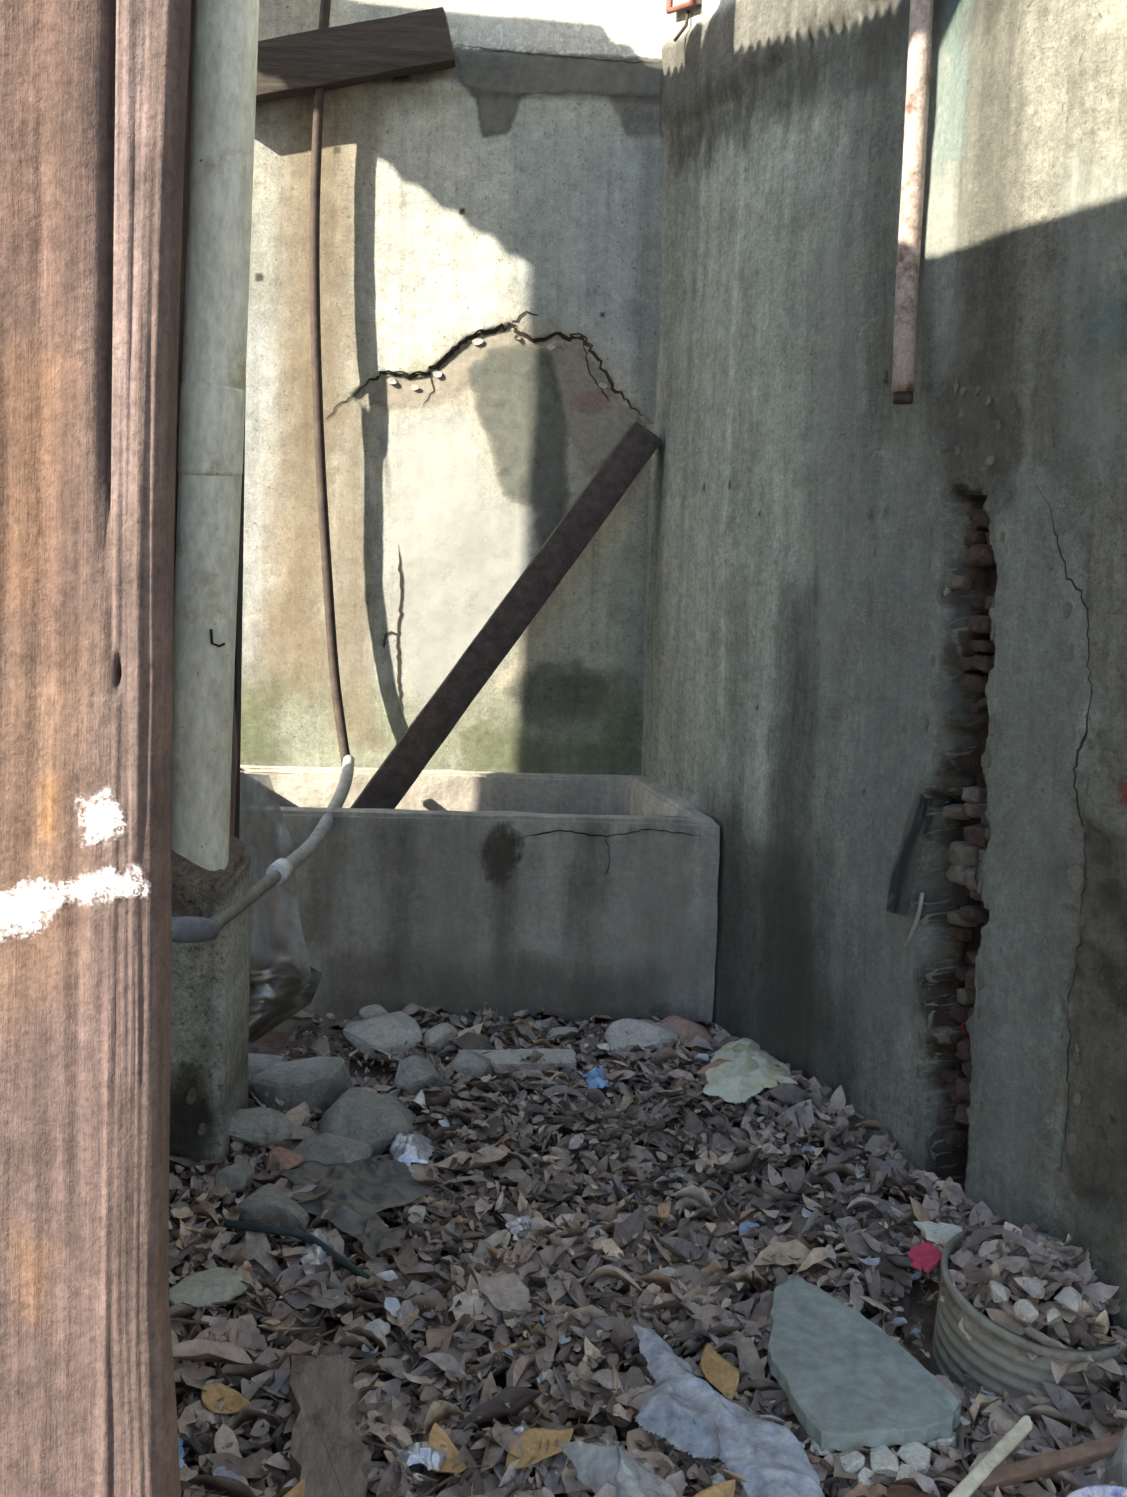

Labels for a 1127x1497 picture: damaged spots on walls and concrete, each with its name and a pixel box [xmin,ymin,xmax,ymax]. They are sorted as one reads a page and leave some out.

spalling [363,334,639,471]
damp [471,346,570,547]
crack [383,546,404,717]
damp [513,665,602,725]
peeling [988,715,997,736]
peeling [1026,467,1095,1218]